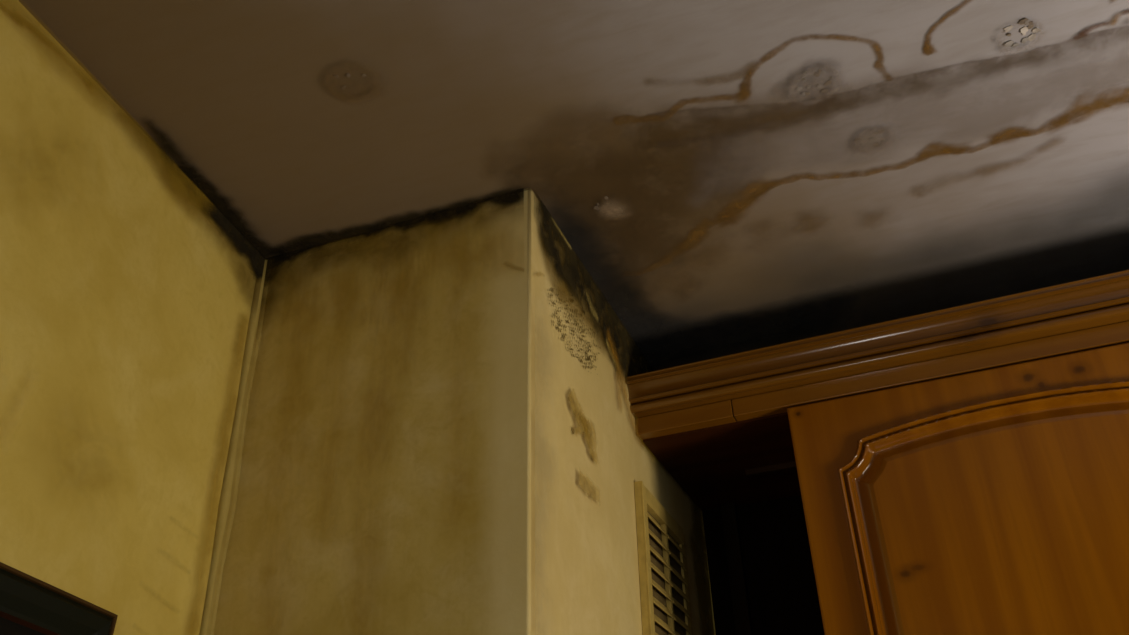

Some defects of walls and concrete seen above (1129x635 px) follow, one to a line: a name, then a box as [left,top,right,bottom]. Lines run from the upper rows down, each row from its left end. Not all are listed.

leakage [802,35,890,79]
leakage [923,0,971,55]
leakage [126,42,1129,376]
peeling [568,389,598,463]